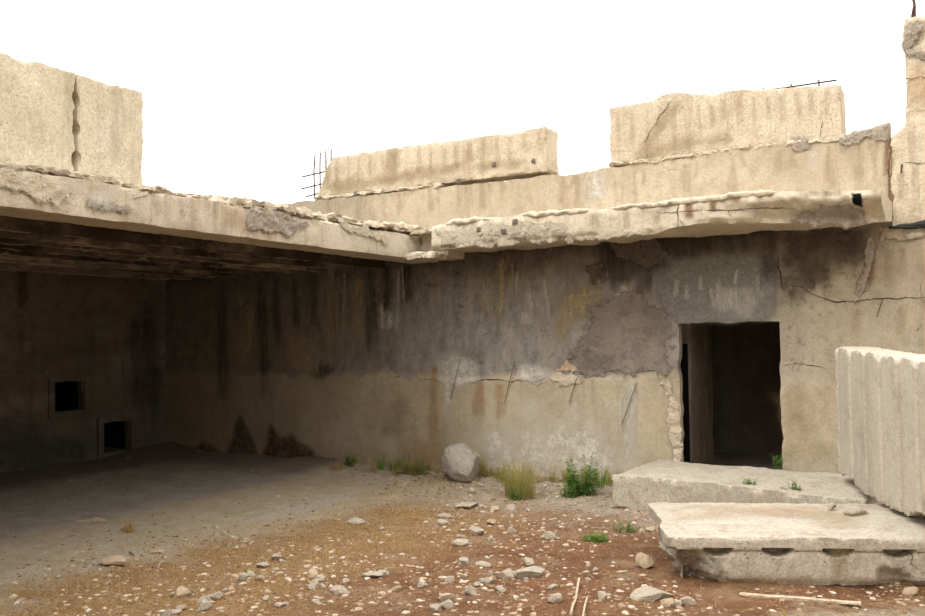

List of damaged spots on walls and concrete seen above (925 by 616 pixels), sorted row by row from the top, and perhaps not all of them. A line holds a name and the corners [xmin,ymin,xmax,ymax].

spalling [900,0,925,60]
spalling [0,169,74,208]
spalling [87,200,135,214]
spalling [791,193,867,230]
crack [777,258,924,303]
flaking render [549,290,683,461]